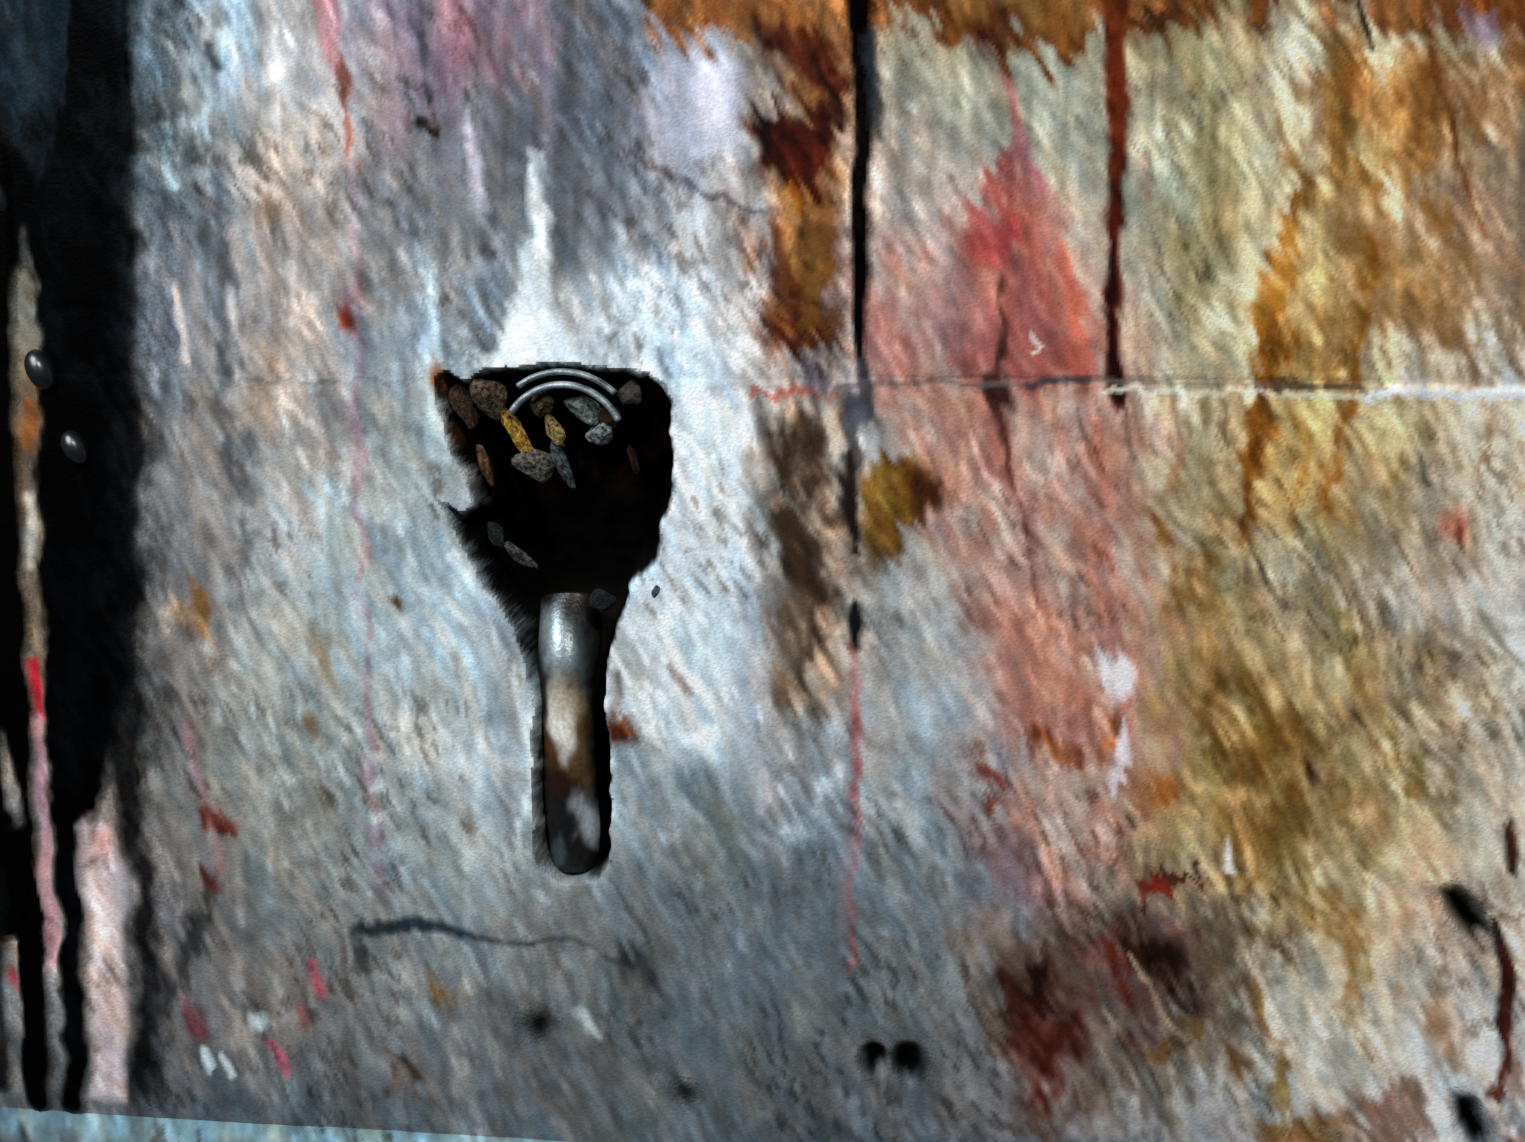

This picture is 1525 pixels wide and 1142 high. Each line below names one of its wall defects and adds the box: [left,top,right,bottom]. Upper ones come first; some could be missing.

damp [0,0,391,1114]
crack [163,368,428,390]
corrosion [420,352,448,402]
damp [435,544,534,947]
corrosion [604,665,652,755]
corrosion [628,0,970,764]
crack [781,342,1367,402]
corrosion [876,0,1525,1142]